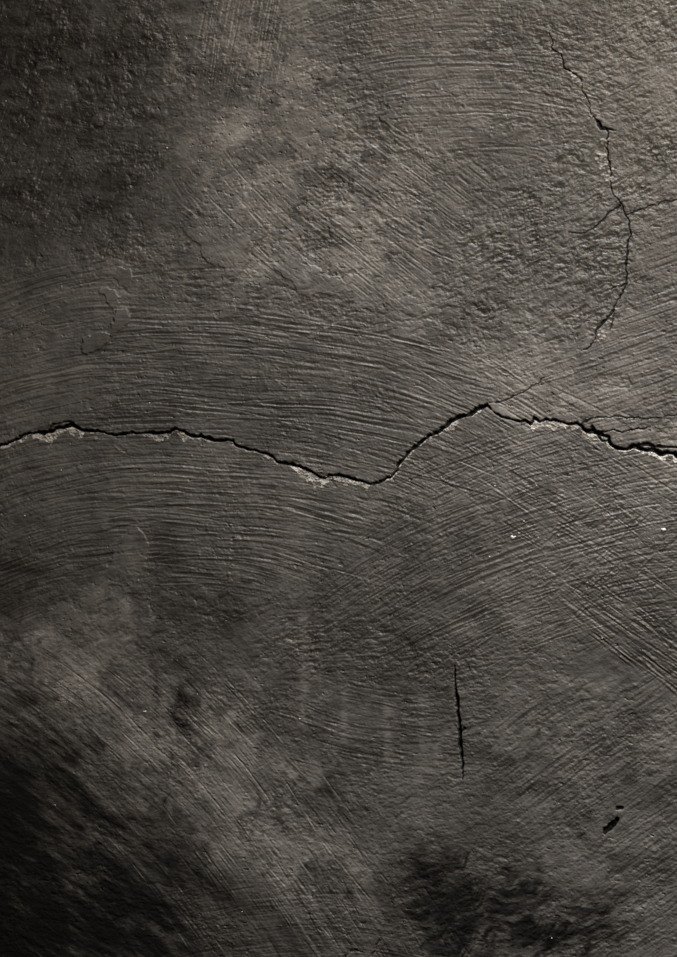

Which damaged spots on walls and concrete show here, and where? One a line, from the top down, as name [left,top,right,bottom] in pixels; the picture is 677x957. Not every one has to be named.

crack [548,32,677,350]
crack [0,377,677,491]